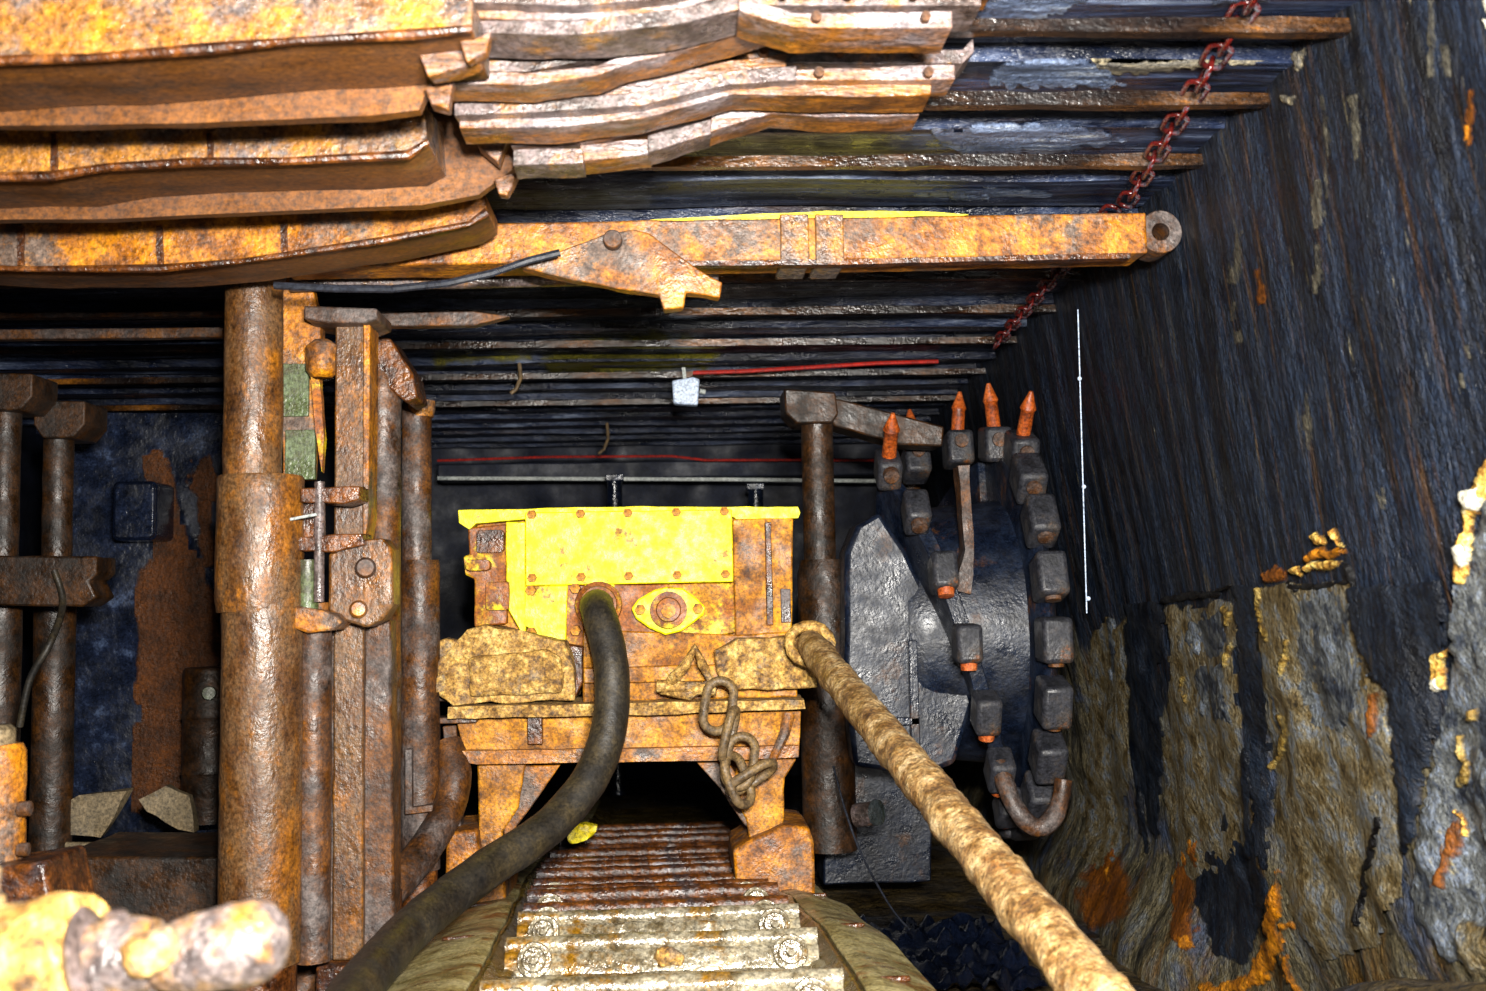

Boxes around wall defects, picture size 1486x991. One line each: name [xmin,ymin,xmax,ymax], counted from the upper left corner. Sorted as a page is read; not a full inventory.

rust [131,449,221,822]
rust [1198,871,1301,991]